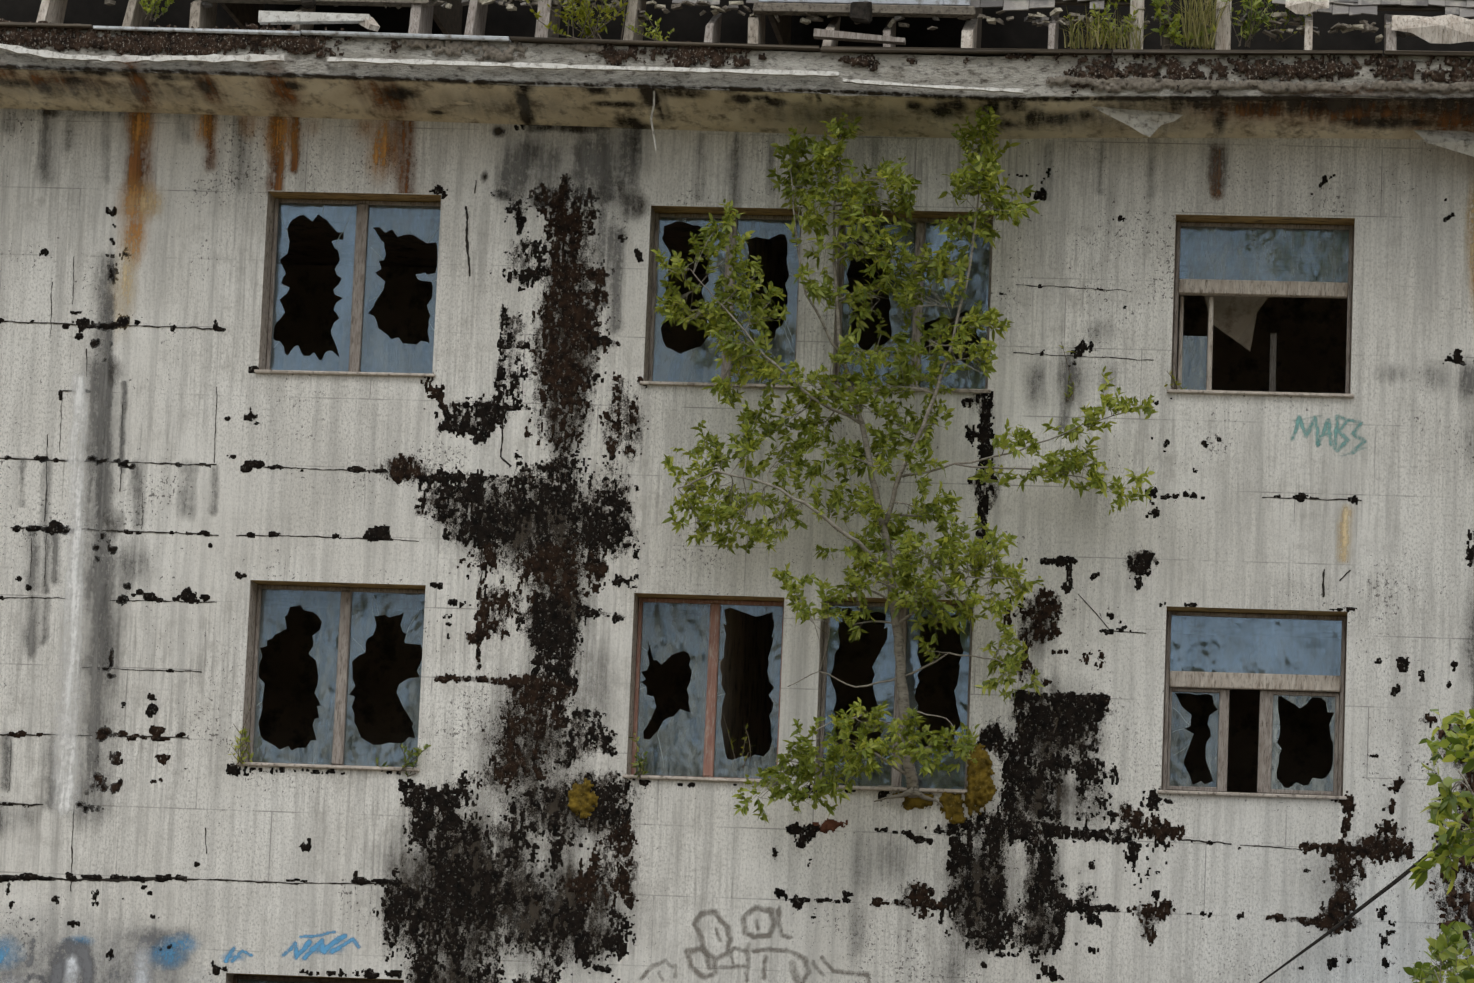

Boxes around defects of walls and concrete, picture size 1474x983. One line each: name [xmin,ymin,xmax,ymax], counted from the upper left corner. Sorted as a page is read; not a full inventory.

rust [123,112,156,300]
rust [268,116,300,191]
water stain [0,61,1474,332]
water stain [1028,356,1081,430]
water stain [1460,365,1474,396]
water stain [480,496,585,632]
water stain [502,713,603,835]
water stain [1011,697,1085,826]
water stain [388,814,617,983]
water stain [952,848,1006,939]